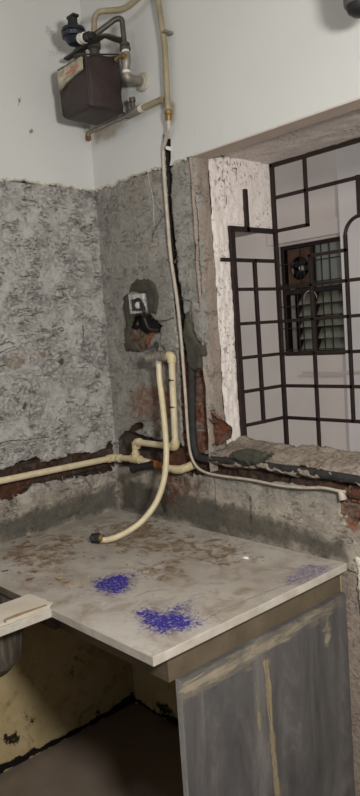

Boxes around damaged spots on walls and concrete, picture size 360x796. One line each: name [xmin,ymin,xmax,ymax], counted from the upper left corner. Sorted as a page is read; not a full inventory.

flaking render [129,313,162,353]
flaking render [0,349,360,531]
leakage [0,691,179,774]